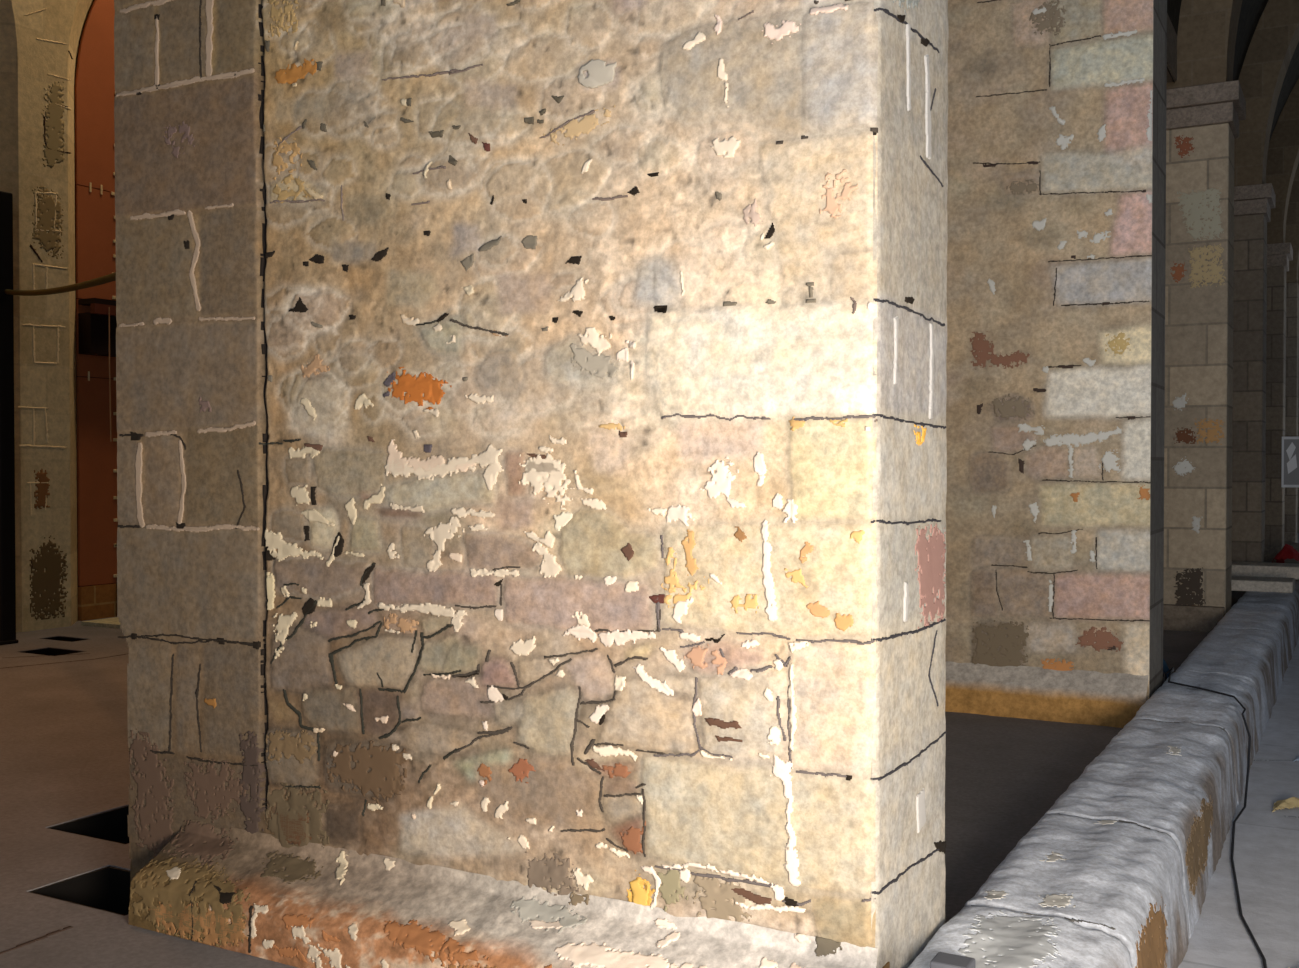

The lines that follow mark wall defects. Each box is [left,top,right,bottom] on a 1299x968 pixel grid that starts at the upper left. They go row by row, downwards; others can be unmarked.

crack [874,8,939,53]
crack [976,35,1101,97]
leakage [42,81,65,168]
crack [920,155,943,187]
crack [973,161,1143,195]
leakage [32,186,64,259]
leakage [30,535,68,620]
spalling [302,598,316,615]
spalling [332,532,344,557]
crack [991,529,1150,622]
crack [118,562,947,906]